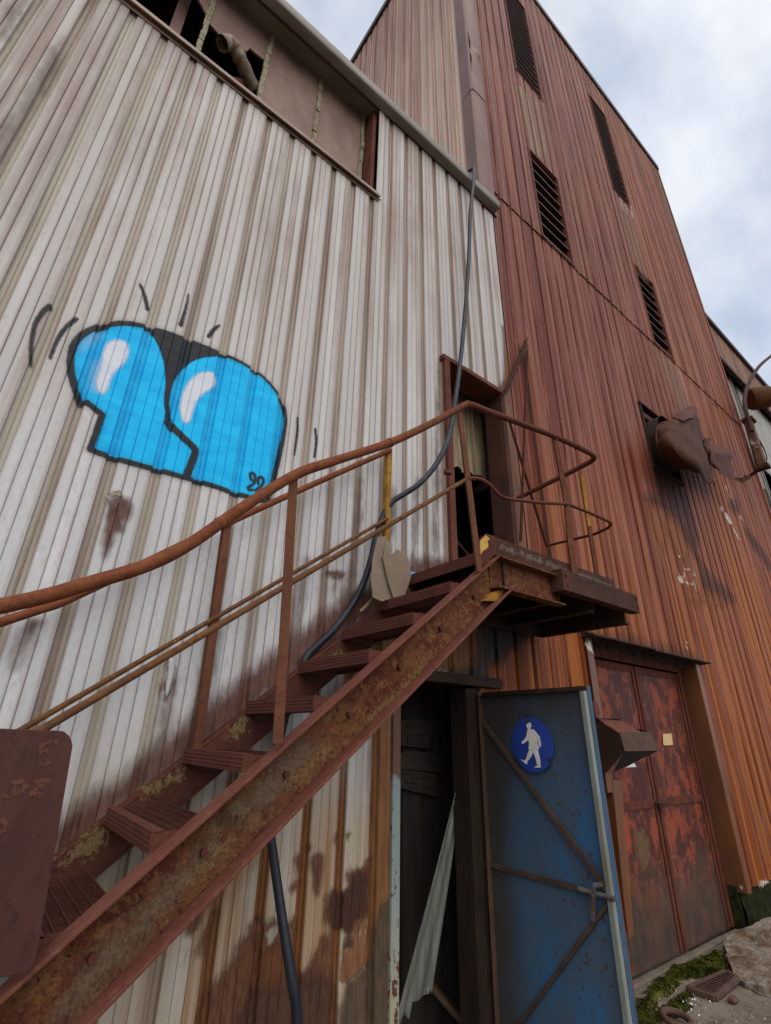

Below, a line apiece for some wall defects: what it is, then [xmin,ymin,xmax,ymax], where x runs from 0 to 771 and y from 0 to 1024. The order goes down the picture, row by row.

corrosion [104,490,131,554]
corrosion [340,716,392,1024]